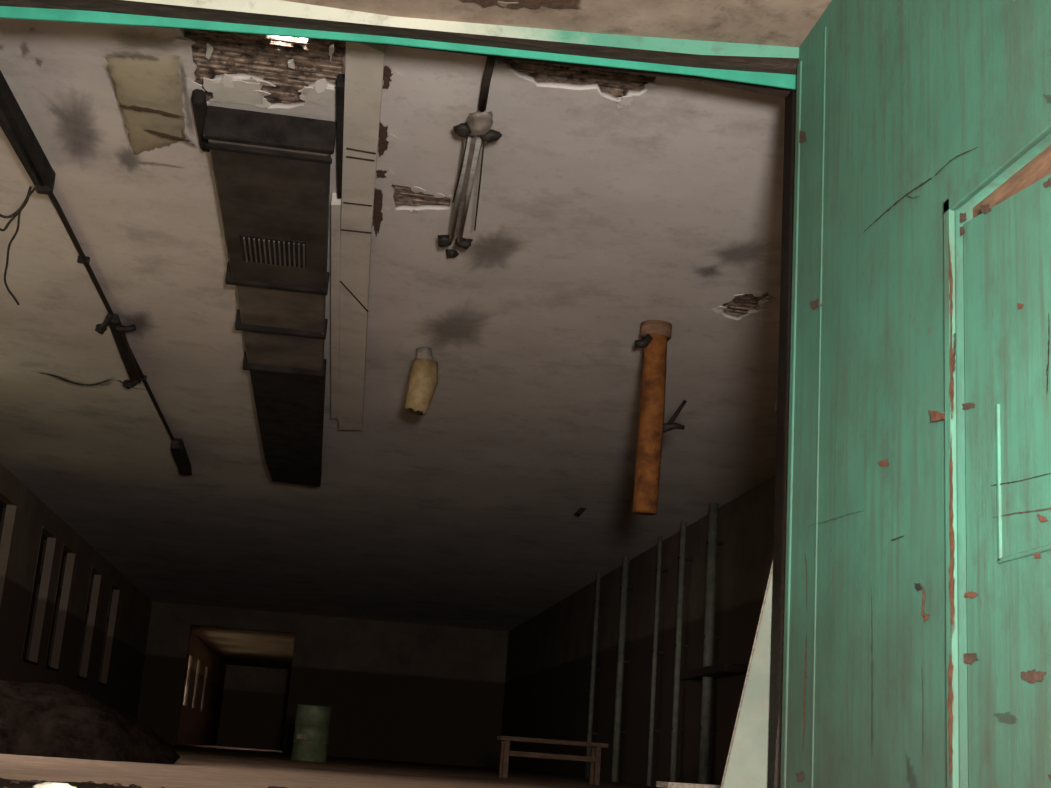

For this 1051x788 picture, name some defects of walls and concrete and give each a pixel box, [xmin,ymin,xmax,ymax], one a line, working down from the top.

spalling [173,29,346,108]
spalling [481,56,659,110]
peeling [378,123,398,157]
spalling [373,169,455,236]
crack [864,147,978,232]
spalling [711,292,777,320]
rust [929,246,956,422]
rust [914,583,929,622]